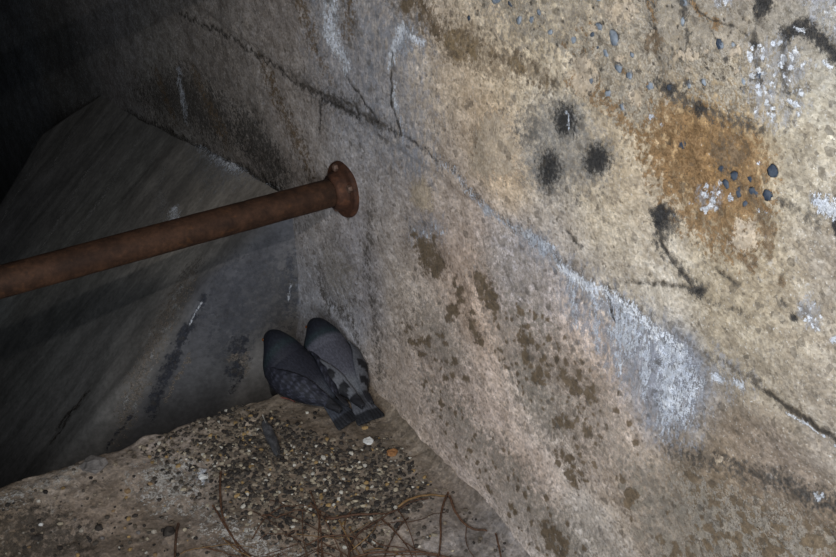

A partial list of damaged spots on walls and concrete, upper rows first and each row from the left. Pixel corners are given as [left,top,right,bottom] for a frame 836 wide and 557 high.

crack [179,13,433,158]
corrosion [563,30,783,277]
corrosion [690,0,723,32]
water stain [429,150,745,442]
crack [626,229,750,318]
crack [753,382,836,447]